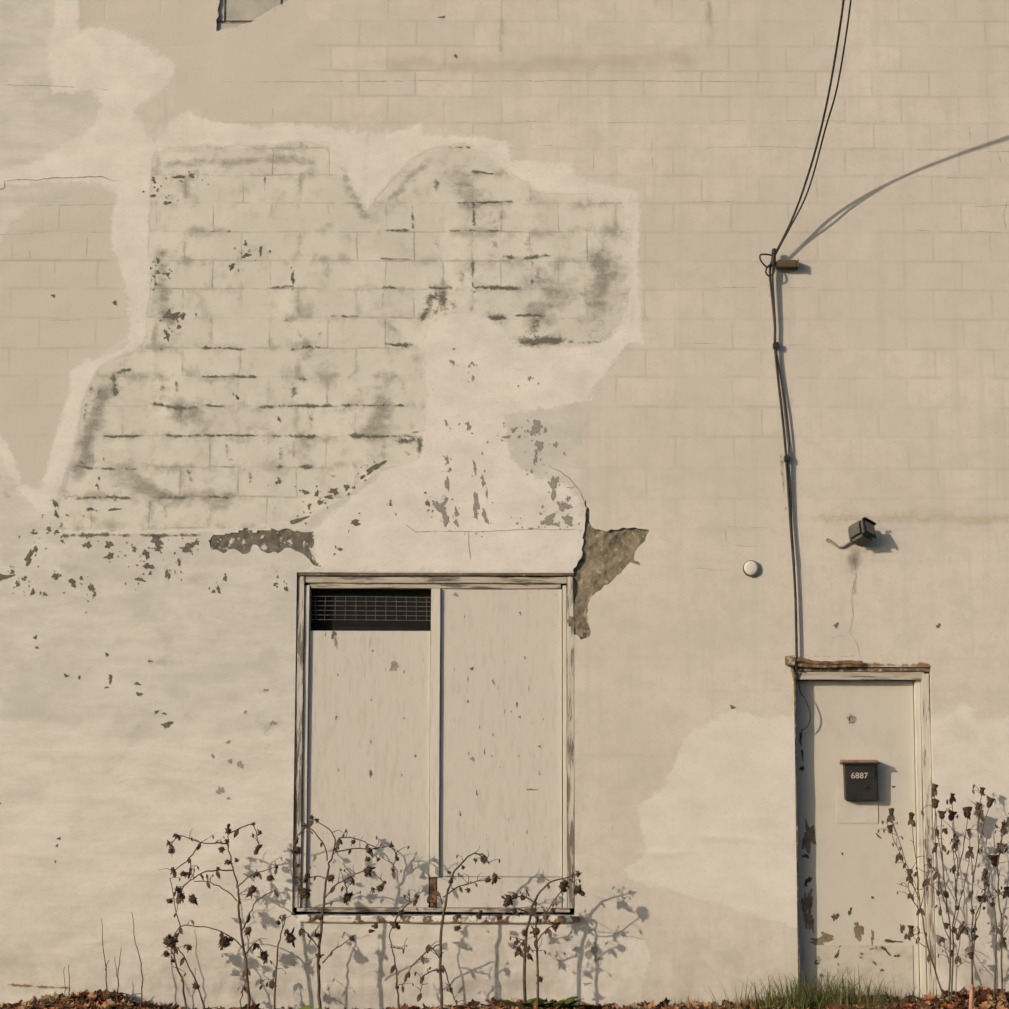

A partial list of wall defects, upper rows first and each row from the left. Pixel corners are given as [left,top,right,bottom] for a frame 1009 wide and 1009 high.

spalling [217,0,288,31]
peeling [0,142,631,596]
spalling [472,419,649,639]
peeling [51,570,96,613]
peeling [802,818,817,859]
peeling [801,876,839,958]
peeling [831,908,912,957]